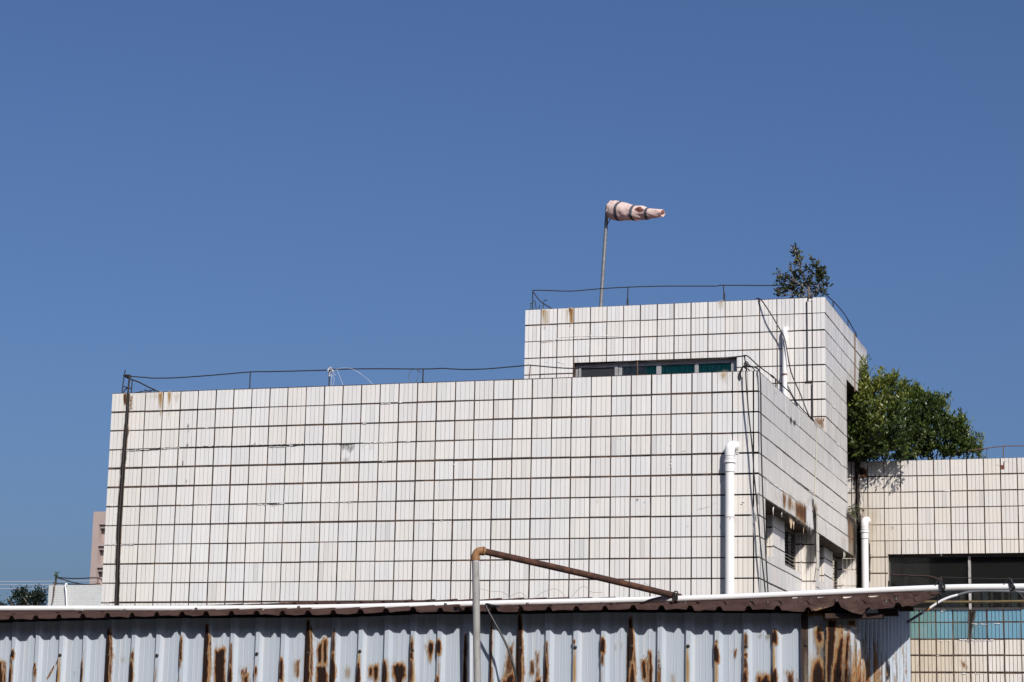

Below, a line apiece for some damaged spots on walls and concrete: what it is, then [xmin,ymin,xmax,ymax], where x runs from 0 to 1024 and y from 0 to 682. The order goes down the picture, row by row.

corrosion [783,489,806,525]
corrosion [202,624,257,682]
corrosion [279,620,442,682]
corrosion [489,612,549,682]
corrosion [626,617,661,682]
corrosion [808,607,907,682]